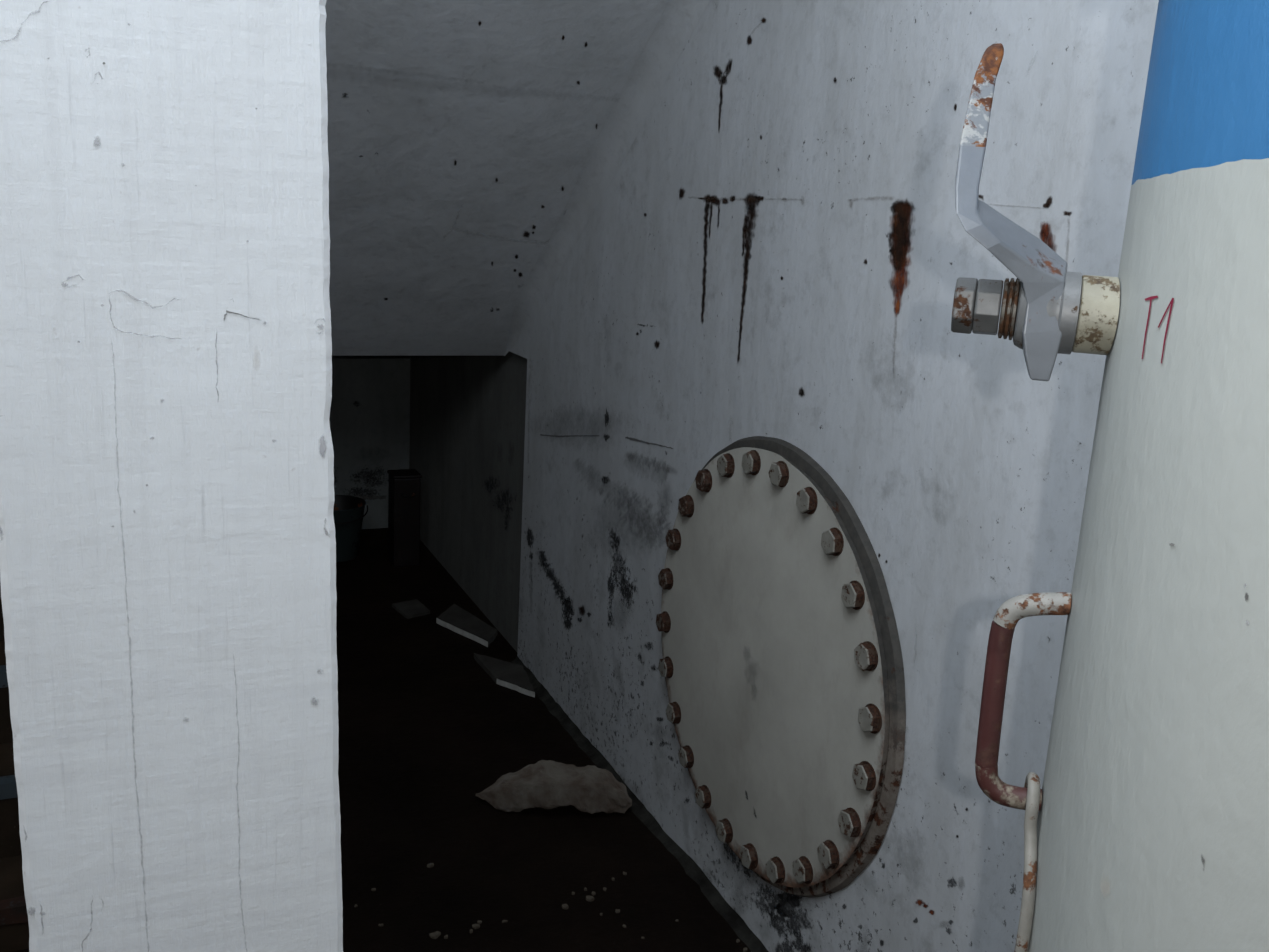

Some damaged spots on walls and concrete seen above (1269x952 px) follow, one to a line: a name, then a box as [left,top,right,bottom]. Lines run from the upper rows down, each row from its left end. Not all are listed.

rust [699,194,764,361]
rust [889,199,914,314]
mould [527,529,591,630]
mould [607,530,636,626]
mould [750,884,814,952]